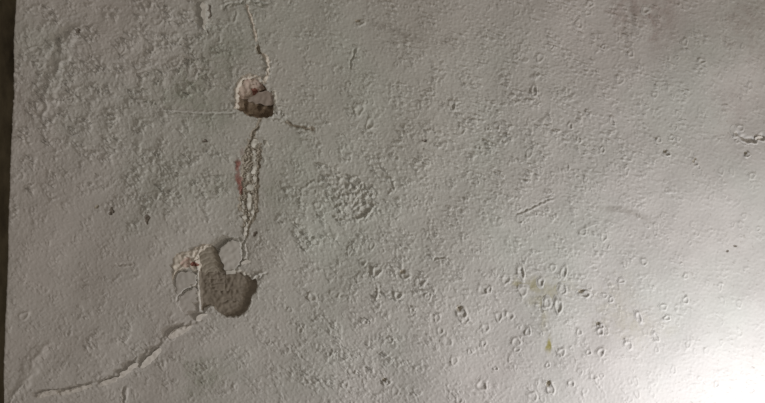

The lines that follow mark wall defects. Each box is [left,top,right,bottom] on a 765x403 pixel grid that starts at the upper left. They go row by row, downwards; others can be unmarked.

crack [214,0,273,85]
spalling [171,73,287,320]
crack [214,232,252,269]
crack [6,303,211,403]